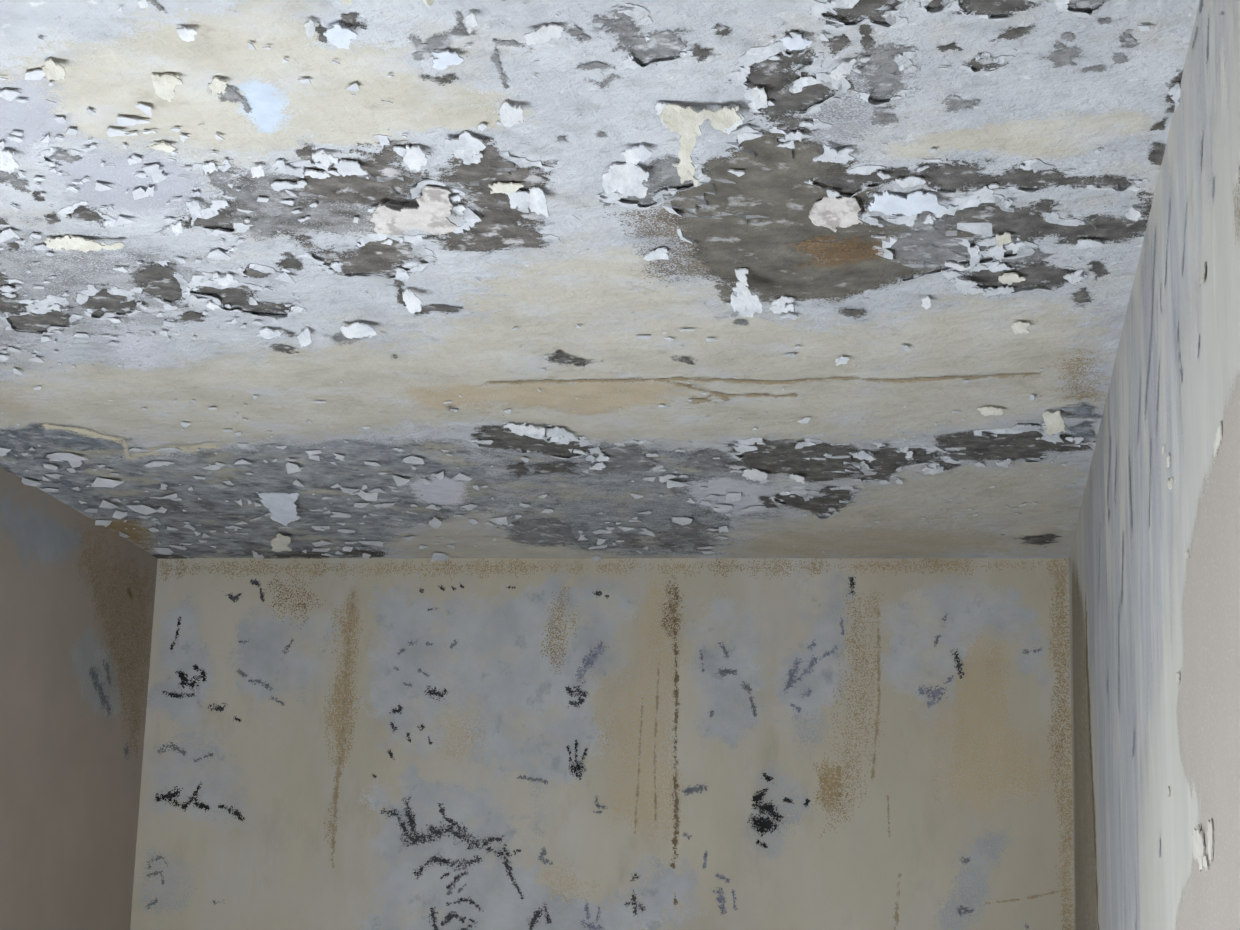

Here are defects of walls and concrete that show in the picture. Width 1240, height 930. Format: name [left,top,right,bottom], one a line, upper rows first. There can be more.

peeling [0,0,1183,562]
damp [603,195,781,301]
damp [1137,201,1187,527]
spalling [1108,448,1133,609]
damp [74,516,1098,930]
peeling [1192,818,1214,872]